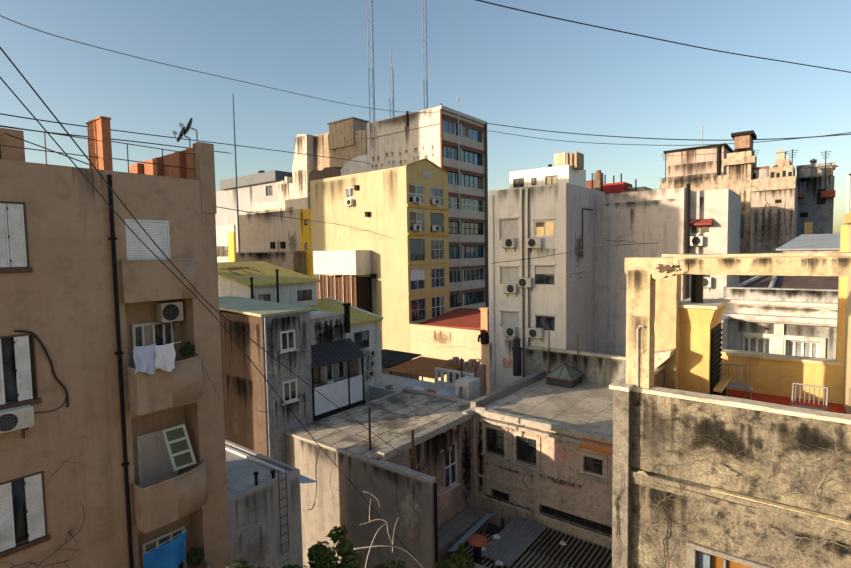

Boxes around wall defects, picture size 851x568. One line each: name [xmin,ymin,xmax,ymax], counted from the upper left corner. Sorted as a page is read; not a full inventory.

leakage [662,150,747,184]
crack [762,192,787,235]
leakage [315,320,343,344]
leakage [224,317,304,386]
leakage [644,402,752,462]
leakage [779,424,851,454]
leakage [640,486,684,519]